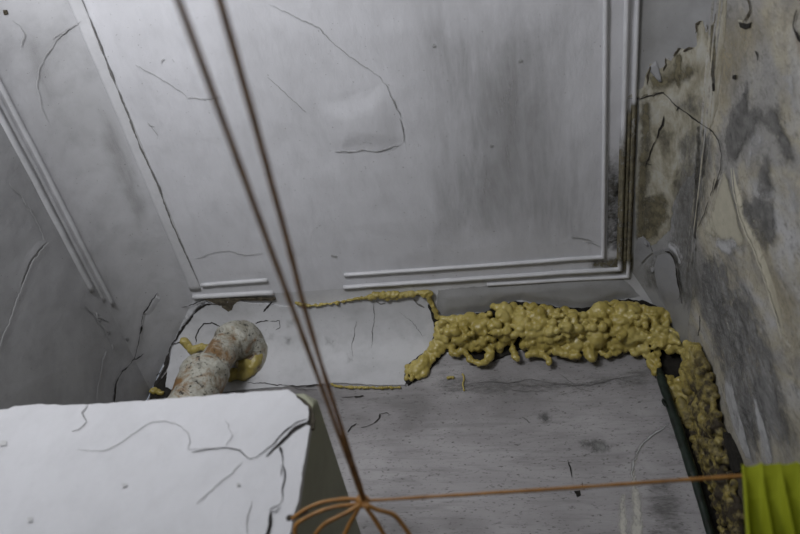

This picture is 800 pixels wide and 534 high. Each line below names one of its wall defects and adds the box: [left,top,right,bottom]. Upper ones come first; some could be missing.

crack [269,4,404,153]
leakage [650,54,693,88]
peeling [634,0,727,273]
leakage [724,86,791,159]
crack [36,1,260,403]
crack [628,88,784,336]
spalling [206,297,276,312]
spalling [468,335,528,362]
spalling [644,345,682,378]
leakage [593,103,793,463]
crack [73,405,311,534]
spalling [680,418,720,534]